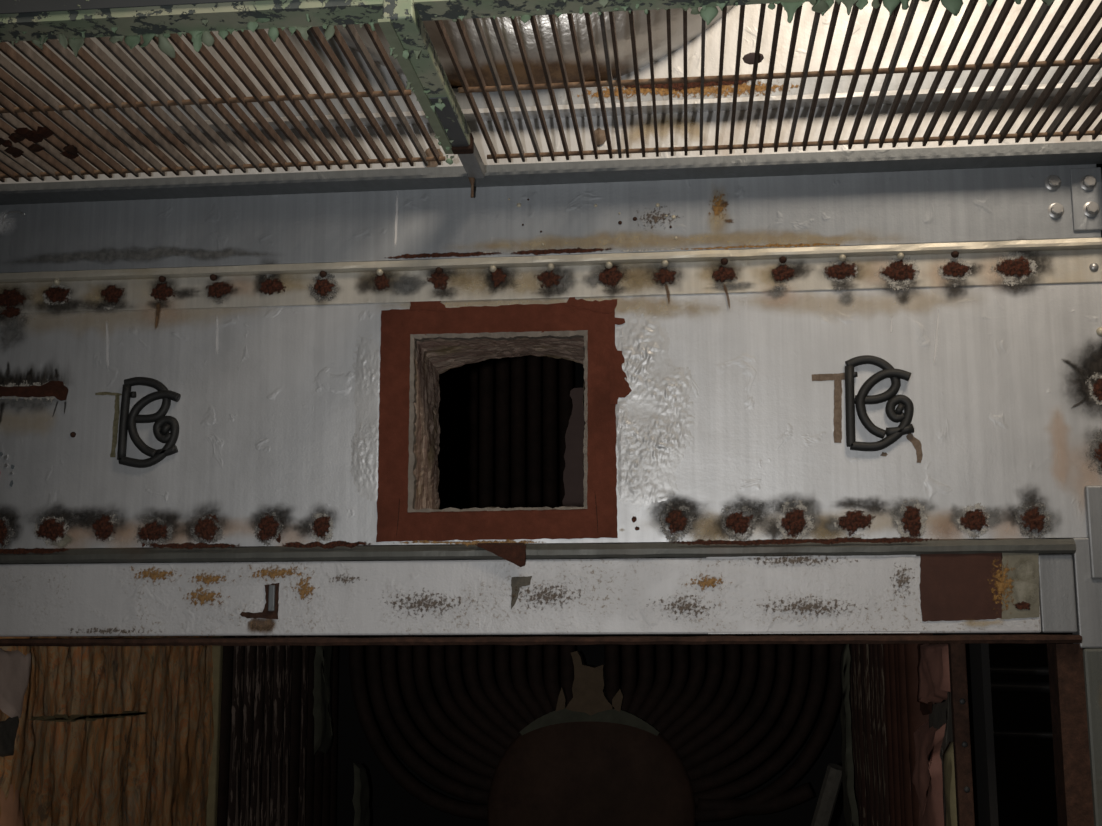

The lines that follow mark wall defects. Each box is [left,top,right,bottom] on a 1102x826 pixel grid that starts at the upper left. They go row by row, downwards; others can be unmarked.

peeling [579,0,738,25]
peeling [768,0,963,23]
peeling [99,14,375,58]
peeling [406,80,445,119]
rust [359,243,858,308]
rust [875,253,920,302]
rust [938,251,977,296]
rust [991,251,1048,293]
rust [253,509,370,549]
rust [952,492,1054,540]
rust [649,498,1040,622]
rust [131,565,315,606]